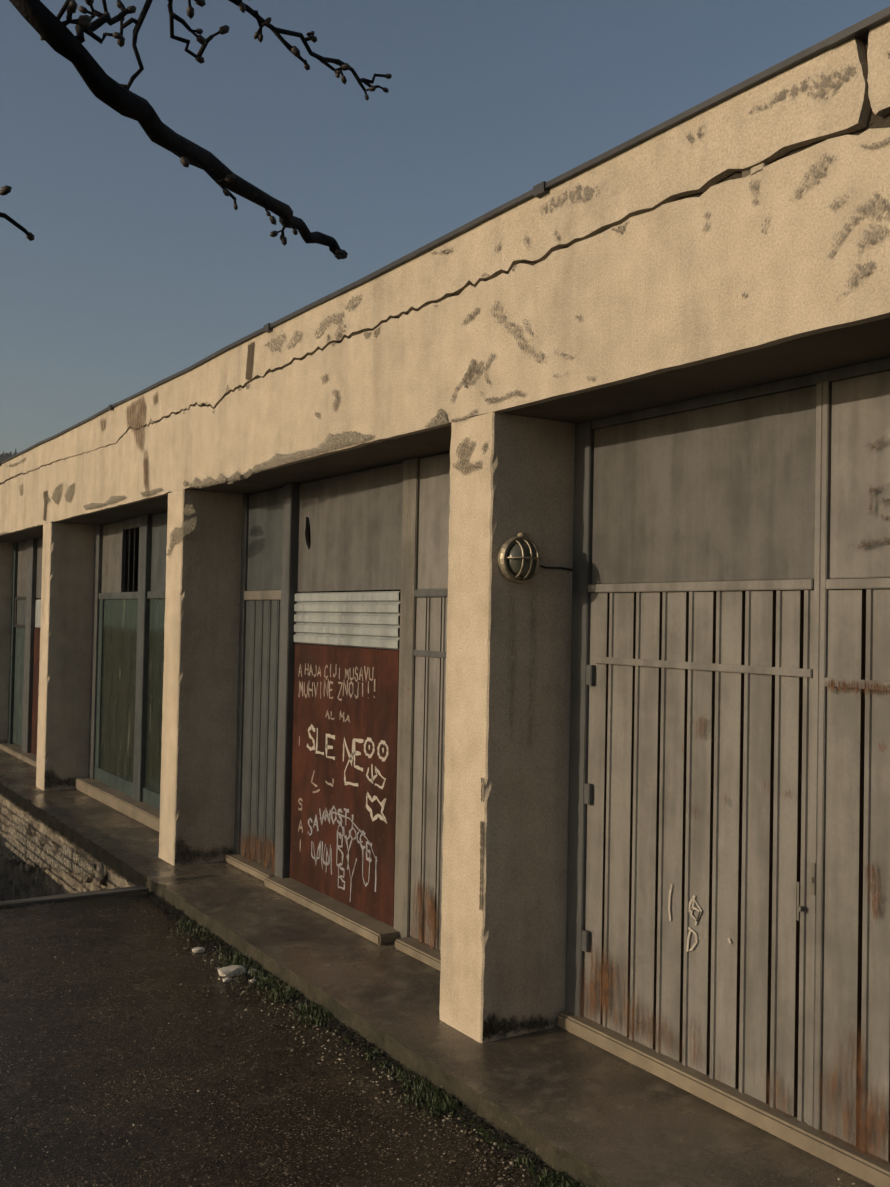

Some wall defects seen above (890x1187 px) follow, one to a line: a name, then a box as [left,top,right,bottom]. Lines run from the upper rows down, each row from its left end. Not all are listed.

crack [861,39,869,64]
peeling [750,66,856,113]
crack [769,108,890,164]
spalling [860,119,890,149]
crack [599,171,742,234]
peeling [828,193,890,300]
crack [137,246,570,430]
peeling [461,302,571,363]
peeling [425,354,524,428]
spalling [183,431,372,488]
peeling [453,438,487,474]
crack [41,465,49,520]